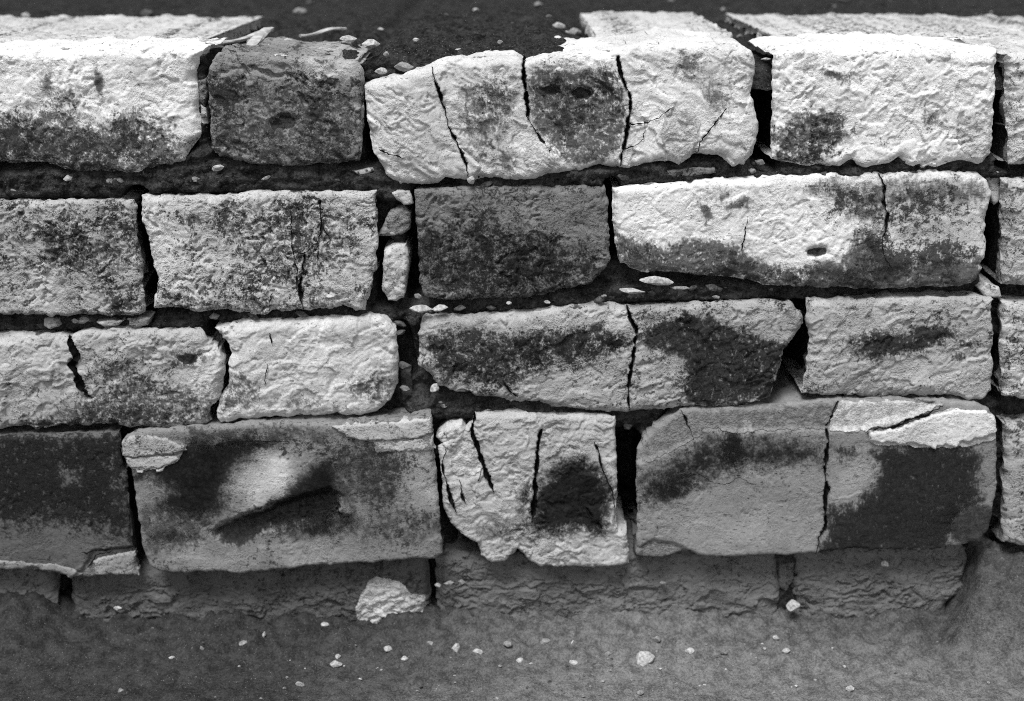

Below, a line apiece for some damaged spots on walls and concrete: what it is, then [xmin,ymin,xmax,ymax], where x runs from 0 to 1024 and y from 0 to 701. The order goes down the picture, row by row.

crack [432,67,469,178]
crack [522,56,551,152]
crack [616,56,673,166]
leakage [612,175,985,289]
crack [67,335,96,402]
leakage [422,309,788,407]
peeling [122,433,187,473]
leakage [0,361,330,553]
crack [441,412,495,513]
leakage [517,455,616,538]
spalling [642,399,997,462]
leakage [818,445,986,552]